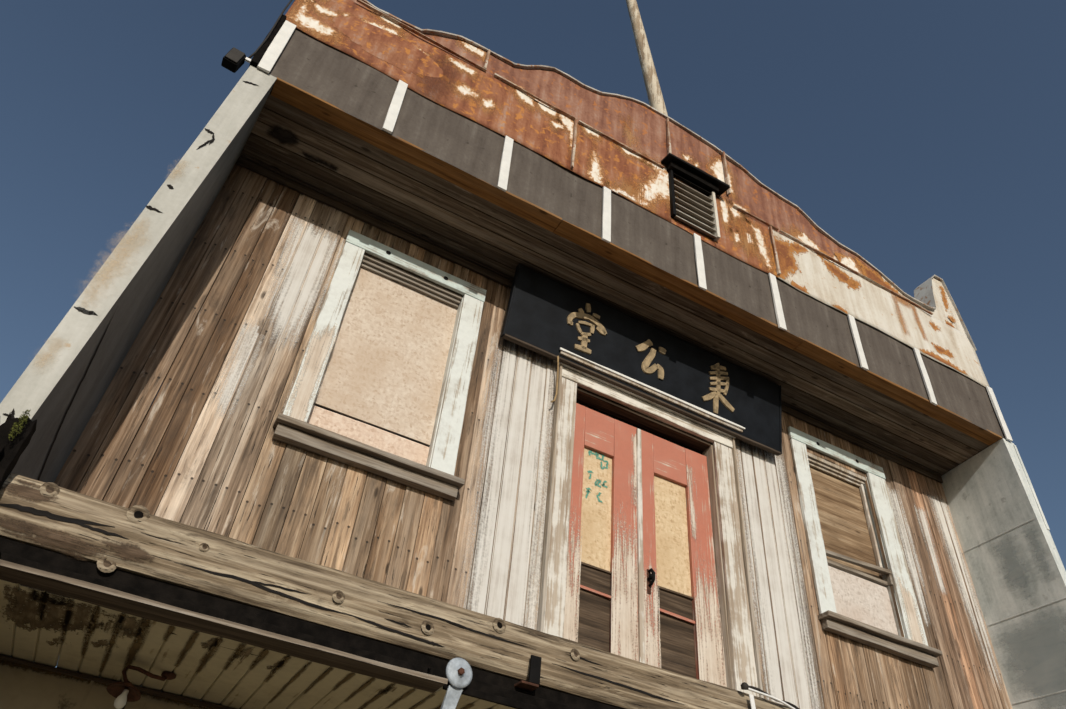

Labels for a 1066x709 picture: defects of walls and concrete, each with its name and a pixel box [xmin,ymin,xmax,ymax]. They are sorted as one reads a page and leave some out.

crack [146,184,174,213]
crack [196,128,215,150]
peeling [512,86,678,210]
corrosion [770,236,967,374]
crack [38,306,115,481]
crack [0,504,128,539]
peeling [611,434,661,668]
peeling [687,467,727,687]
peeling [736,444,819,709]
leakage [0,606,126,687]
leakage [305,668,441,709]
leakage [1001,615,1066,709]